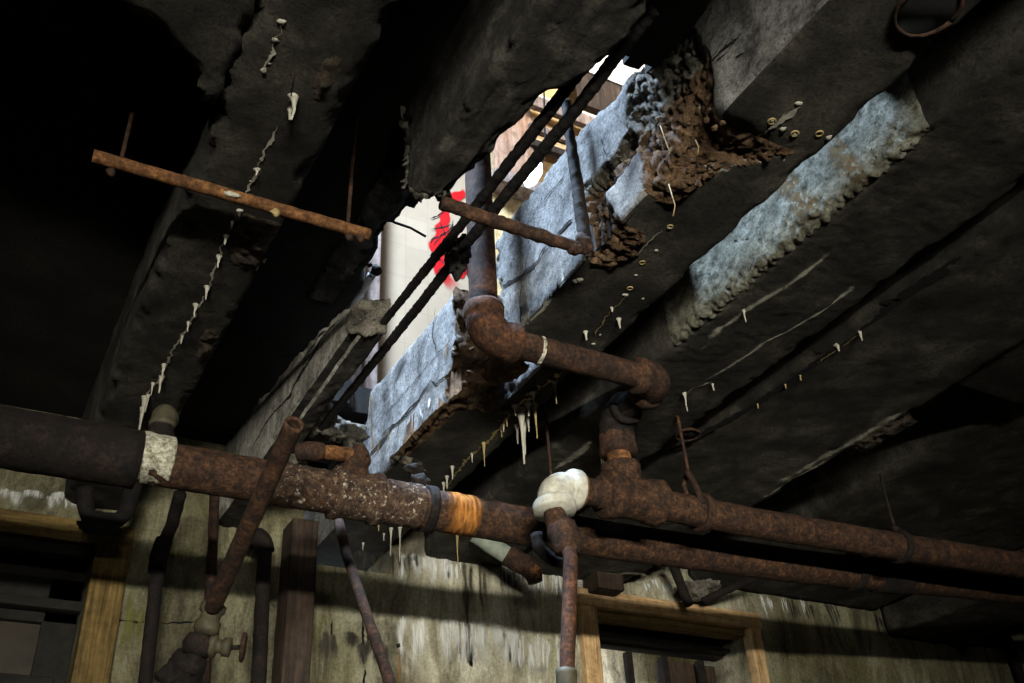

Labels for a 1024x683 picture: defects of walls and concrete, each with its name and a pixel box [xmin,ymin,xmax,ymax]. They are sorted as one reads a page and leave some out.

damp [260,19,286,74]
damp [287,93,299,121]
spalling [396,105,457,204]
spalling [470,5,659,214]
damp [767,101,803,137]
damp [138,129,277,430]
spalling [318,217,534,465]
damp [583,260,646,345]
damp [711,259,822,336]
damp [721,292,848,372]
damp [442,371,564,491]